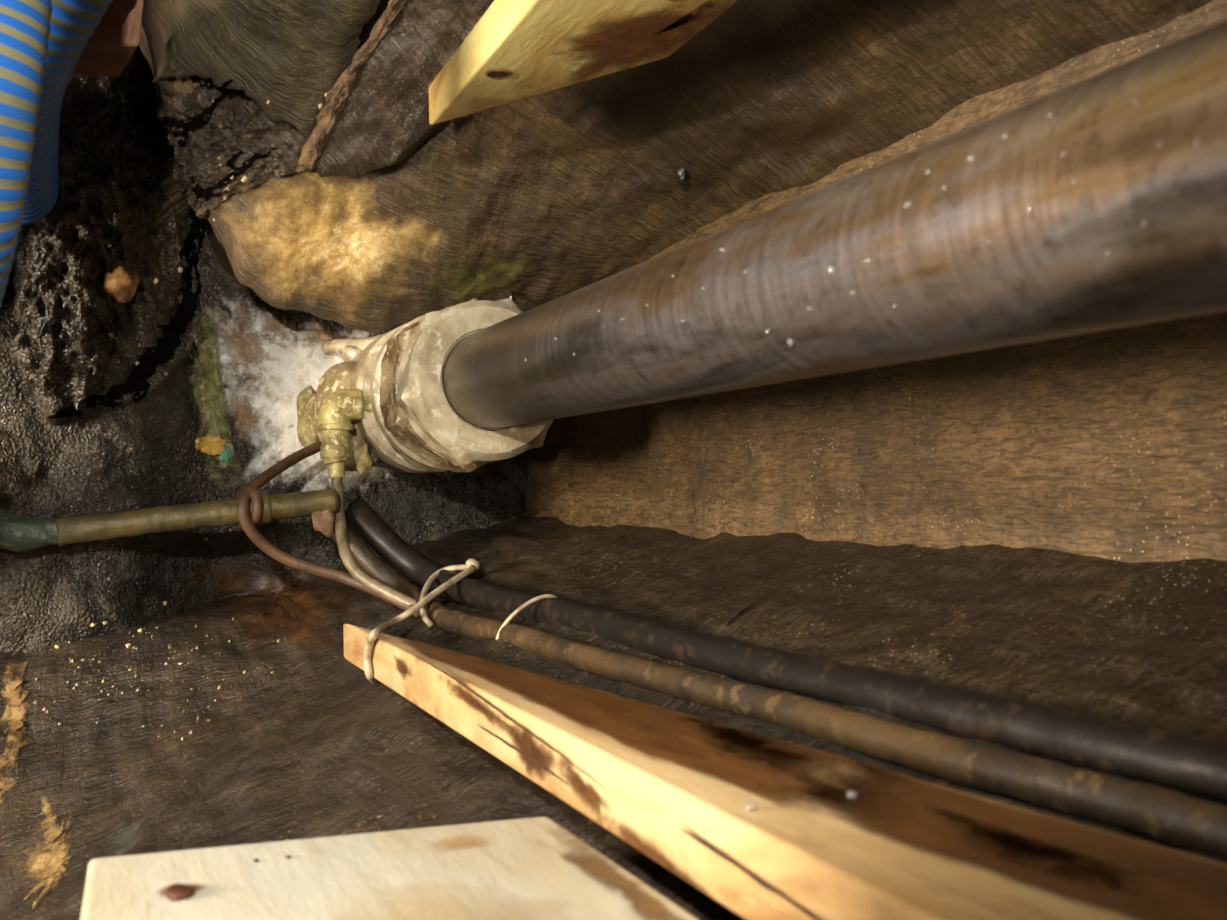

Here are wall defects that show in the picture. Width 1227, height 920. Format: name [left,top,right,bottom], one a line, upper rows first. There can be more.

crack [162,76,249,160]
crack [47,125,297,419]
damp [328,225,381,272]
damp [215,305,368,492]
damp [343,467,377,487]